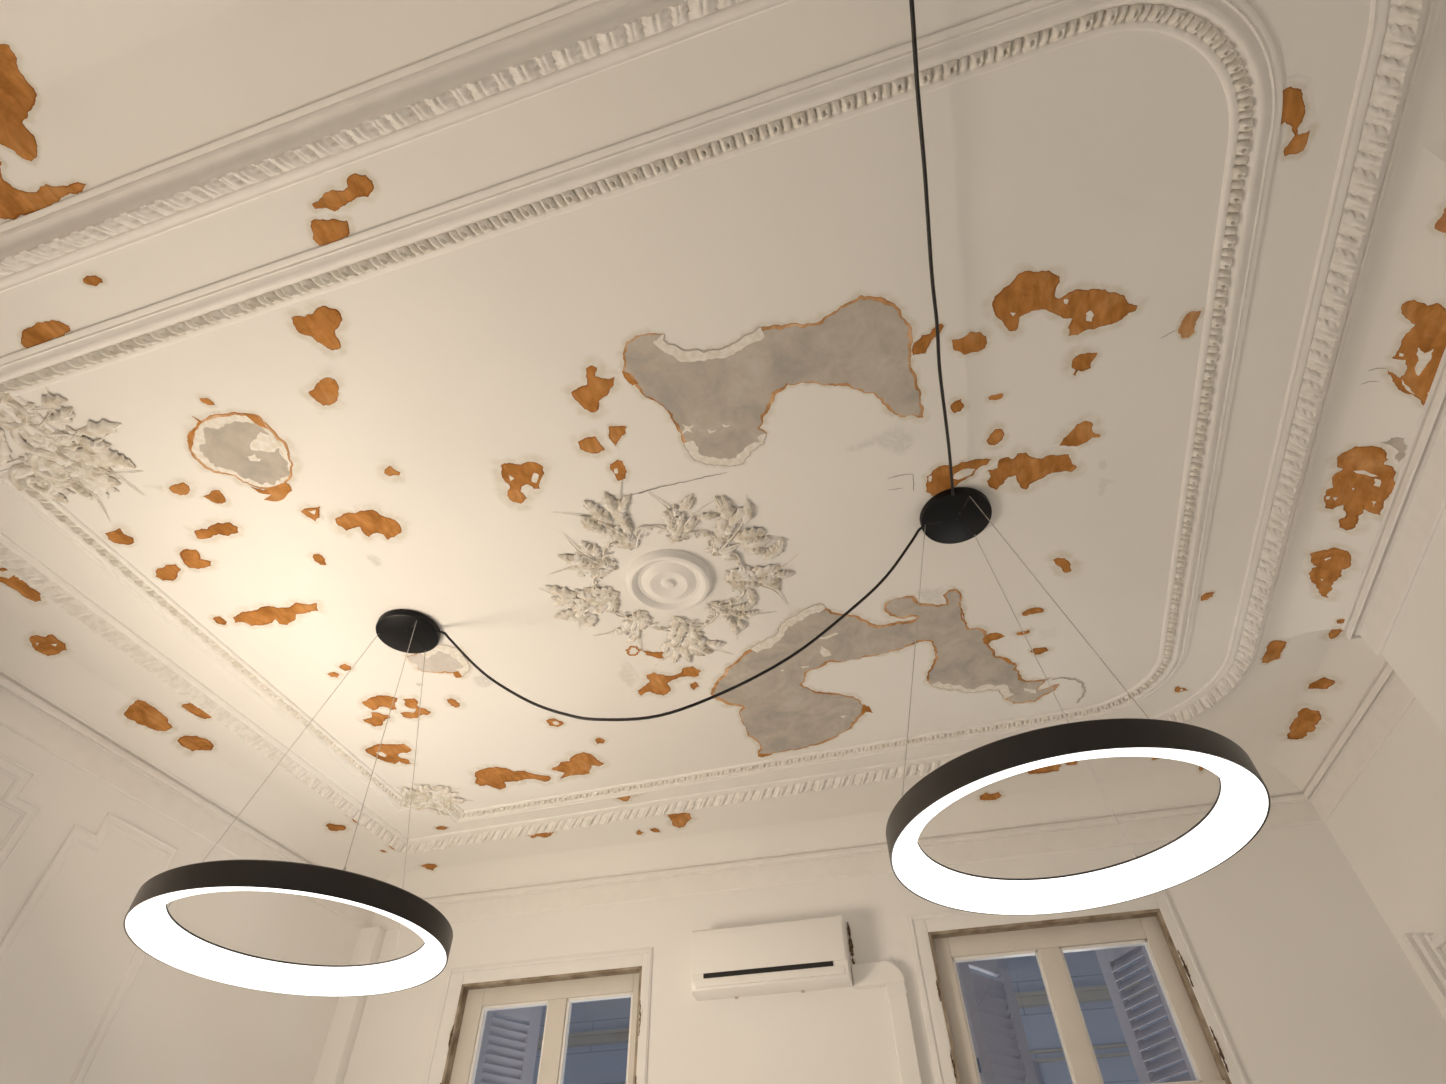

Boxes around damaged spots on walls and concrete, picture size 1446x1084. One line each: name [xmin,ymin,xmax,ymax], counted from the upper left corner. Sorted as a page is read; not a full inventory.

peeling [0,38,94,225]
peeling [1275,75,1322,165]
spalling [557,258,1151,501]
peeling [1376,294,1446,410]
peeling [0,564,52,610]
peeling [18,629,76,661]
peeling [205,597,328,631]
spalling [141,391,415,584]
peeling [484,449,558,514]
spalling [625,584,1086,759]
peeling [1297,437,1407,643]